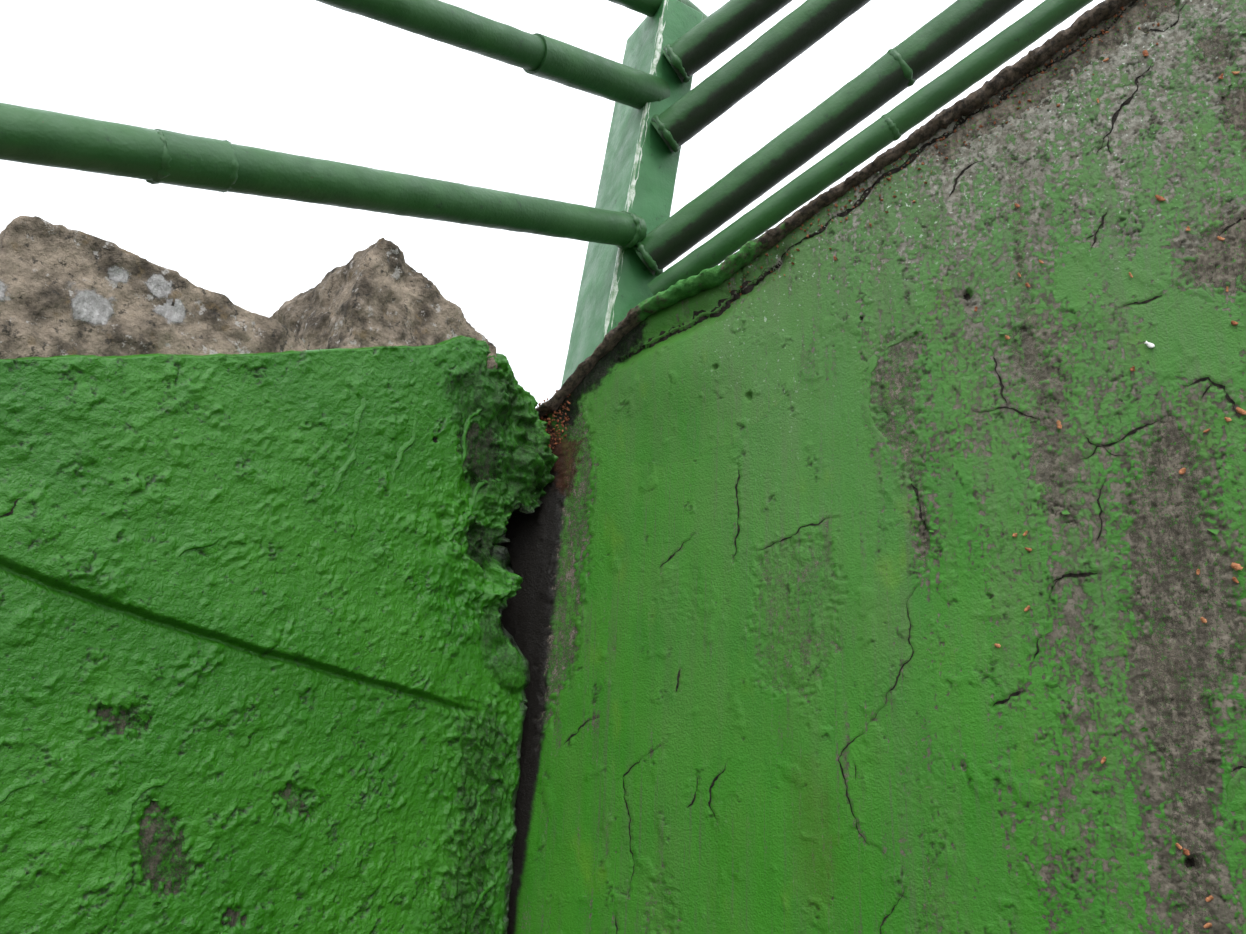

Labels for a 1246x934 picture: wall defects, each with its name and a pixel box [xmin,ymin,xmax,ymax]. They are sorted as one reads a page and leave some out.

peeling [927,0,1180,165]
peeling [1185,26,1246,152]
peeling [1177,208,1246,294]
crack [1219,218,1246,236]
peeling [866,324,934,572]
crack [983,349,1044,422]
crack [1071,416,1165,542]
crack [1187,377,1239,417]
crack [1050,572,1098,594]
crack [838,588,916,853]
peeling [1127,413,1246,934]
crack [880,888,905,934]